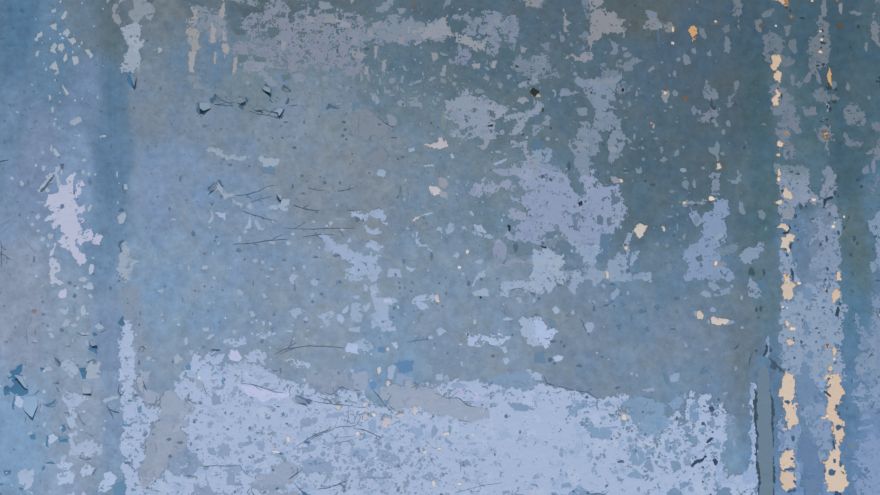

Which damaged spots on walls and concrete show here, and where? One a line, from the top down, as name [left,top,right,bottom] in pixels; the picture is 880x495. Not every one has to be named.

peeling [119,0,155,86]
peeling [770,54,783,106]
peeling [206,147,280,167]
peeling [397,137,454,160]
peeling [27,148,104,338]
peeling [313,207,415,355]
peeling [412,292,447,310]
peeling [436,211,501,242]
peeling [453,223,652,311]
peeling [680,196,735,298]
peeling [739,241,766,318]
peeling [48,310,761,495]